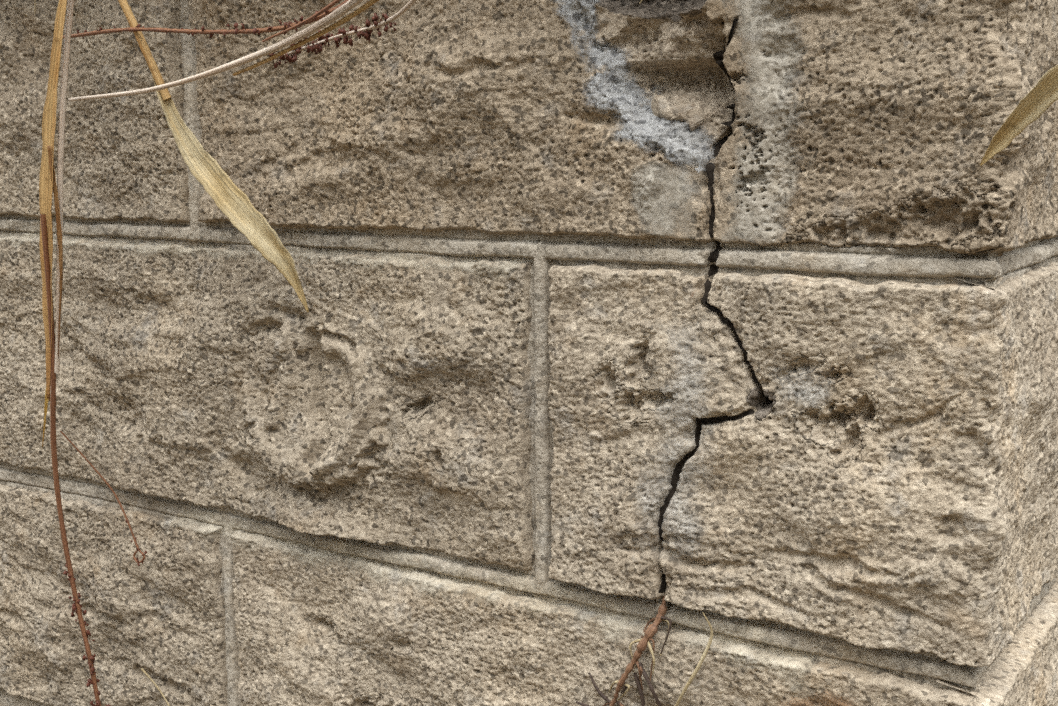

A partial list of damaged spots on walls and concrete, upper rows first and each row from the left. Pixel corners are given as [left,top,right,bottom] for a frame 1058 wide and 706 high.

damp [555,0,719,237]
spalling [573,0,736,158]
crack [657,18,772,593]